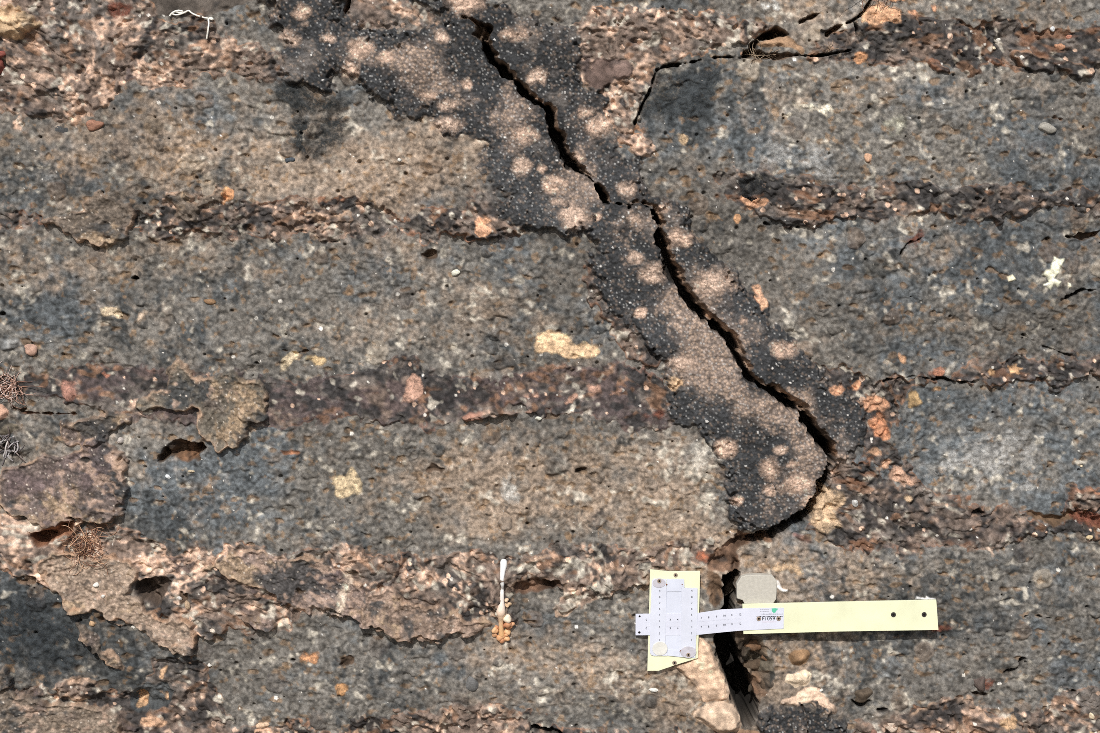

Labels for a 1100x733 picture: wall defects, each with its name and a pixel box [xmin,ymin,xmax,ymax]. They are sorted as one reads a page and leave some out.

crack [632,0,873,127]
crack [461,15,839,546]
peeling [0,359,269,670]
peeling [202,540,715,644]
peeling [0,666,140,733]
spalling [130,681,176,714]
crack [530,724,562,733]
crack [705,568,777,728]
crack [800,704,810,733]